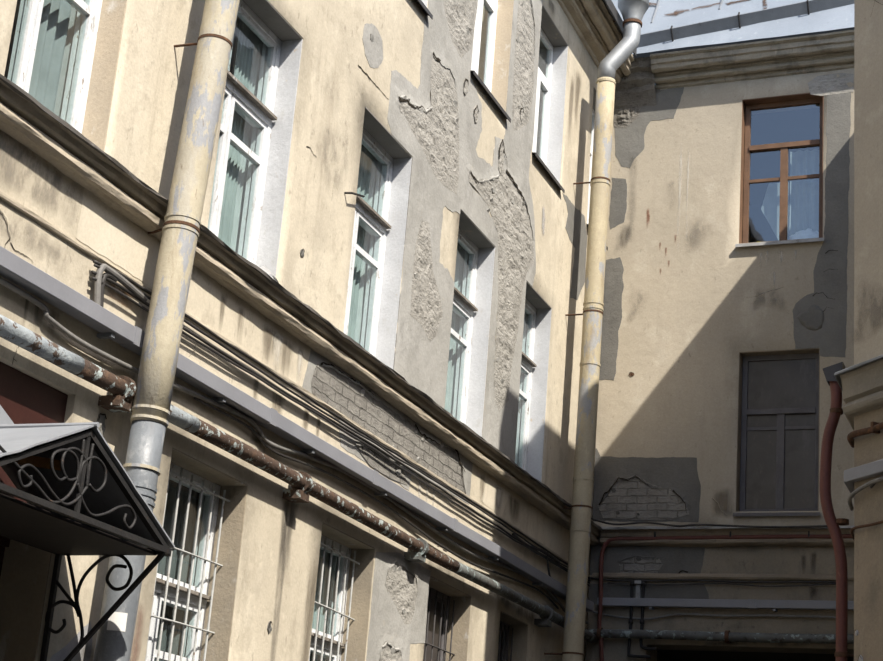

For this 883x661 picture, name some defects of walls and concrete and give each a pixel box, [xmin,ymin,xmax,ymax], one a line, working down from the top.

spalling [443,0,478,58]
corrosion [665,0,747,15]
spalling [512,0,535,130]
spalling [613,103,641,128]
crack [0,207,33,262]
spalling [398,54,534,412]
spalling [311,360,465,492]
spalling [386,560,418,624]
spalling [380,640,403,661]